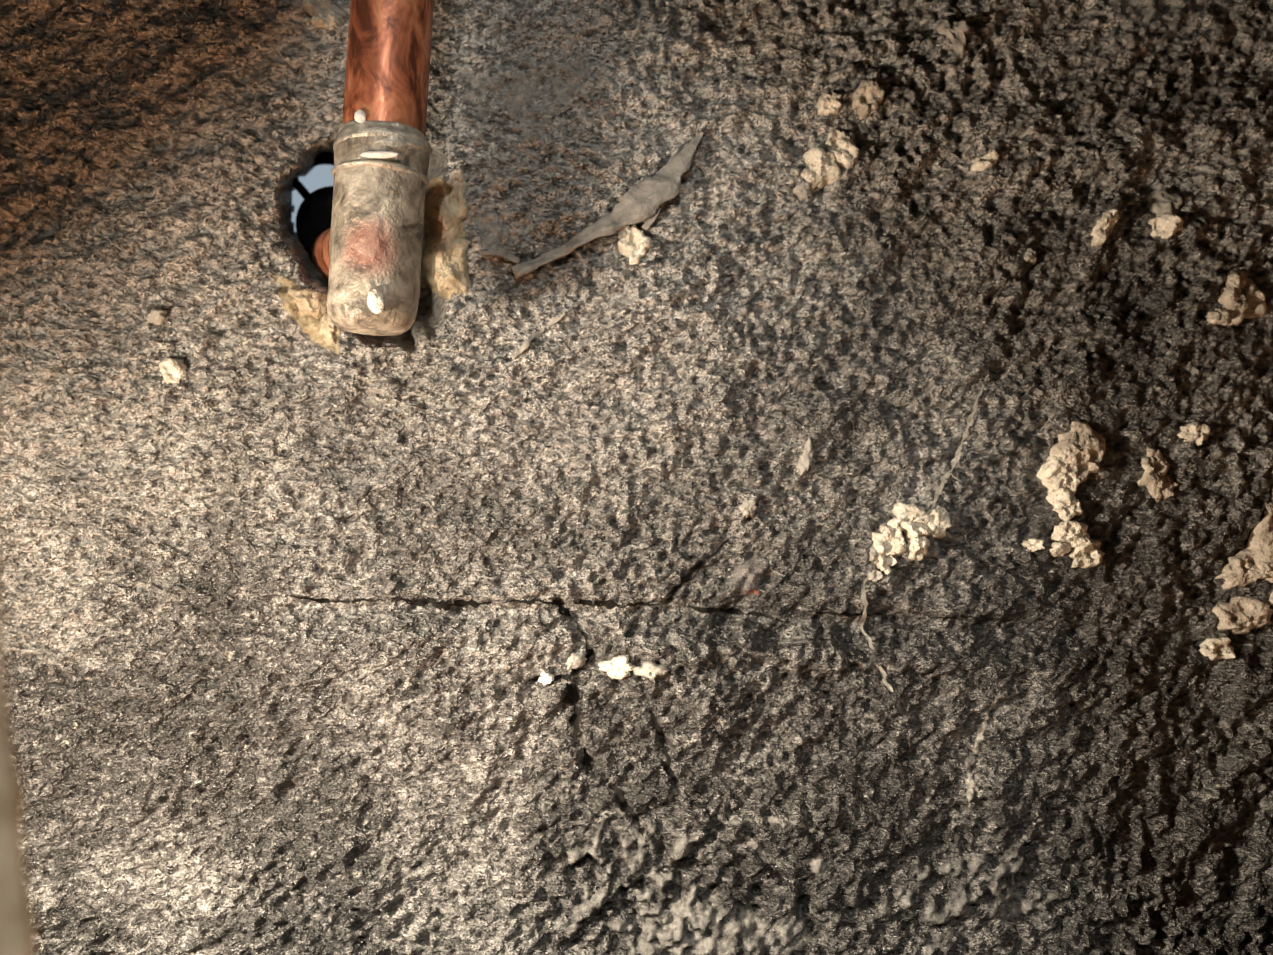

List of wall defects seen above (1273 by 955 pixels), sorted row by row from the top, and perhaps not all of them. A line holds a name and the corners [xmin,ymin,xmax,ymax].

spalling [867,502,952,582]
spalling [1021,421,1105,568]
crack [928,614,1003,622]
crack [279,539,894,848]